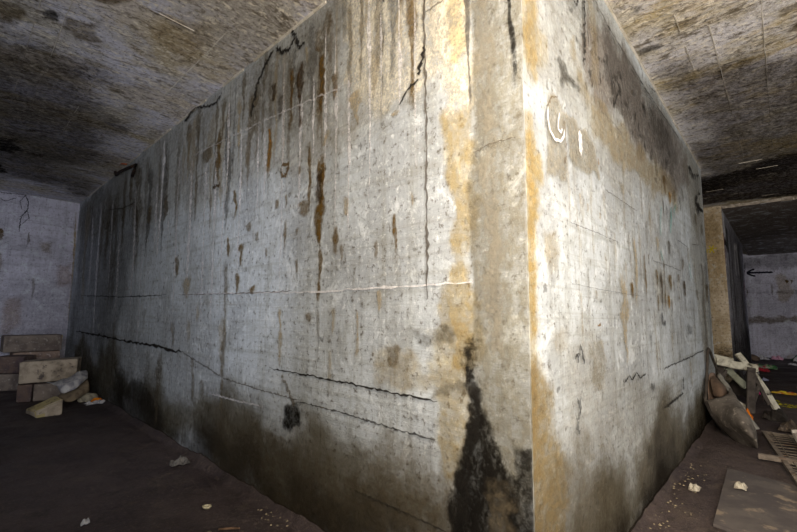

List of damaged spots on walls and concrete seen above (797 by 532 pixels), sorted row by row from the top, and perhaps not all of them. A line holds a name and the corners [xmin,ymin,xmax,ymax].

crack [1,192,30,231]
crack [250,30,305,116]
corrosion [264,51,304,127]
corrosion [299,147,326,299]
corrosion [319,55,338,112]
crack [399,0,443,298]
crack [574,0,678,137]
water stain [690,61,797,205]
corrosion [220,238,243,409]
water stain [281,375,300,429]
water stain [448,338,534,532]
water stain [574,395,712,532]